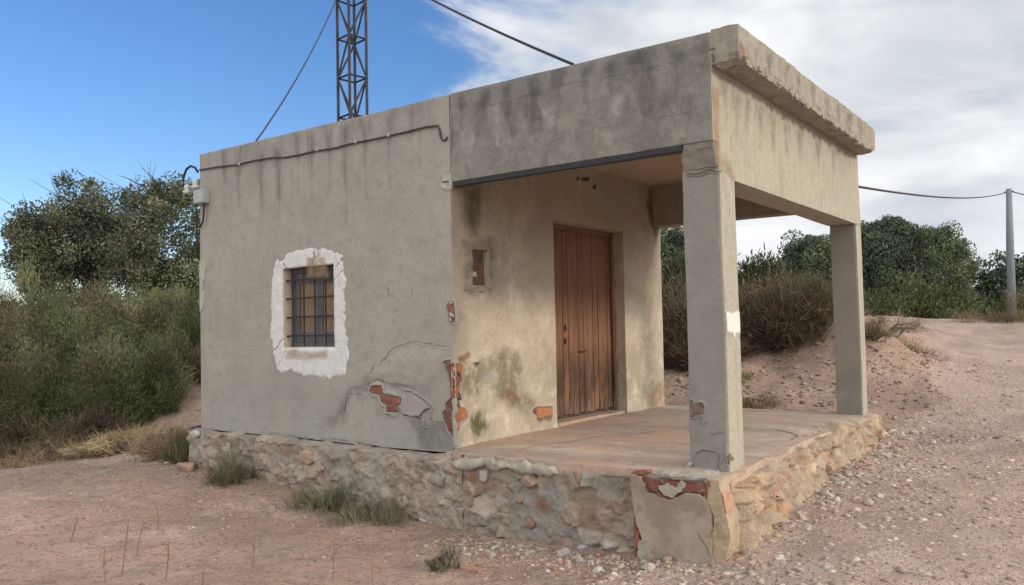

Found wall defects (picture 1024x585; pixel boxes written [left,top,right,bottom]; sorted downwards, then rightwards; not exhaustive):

spalling [445,288,467,326]
crack [344,341,452,412]
spalling [367,357,480,449]
flaking render [531,404,553,423]
flaking render [688,398,708,420]
flaking render [631,469,708,500]
flaking render [722,492,735,513]